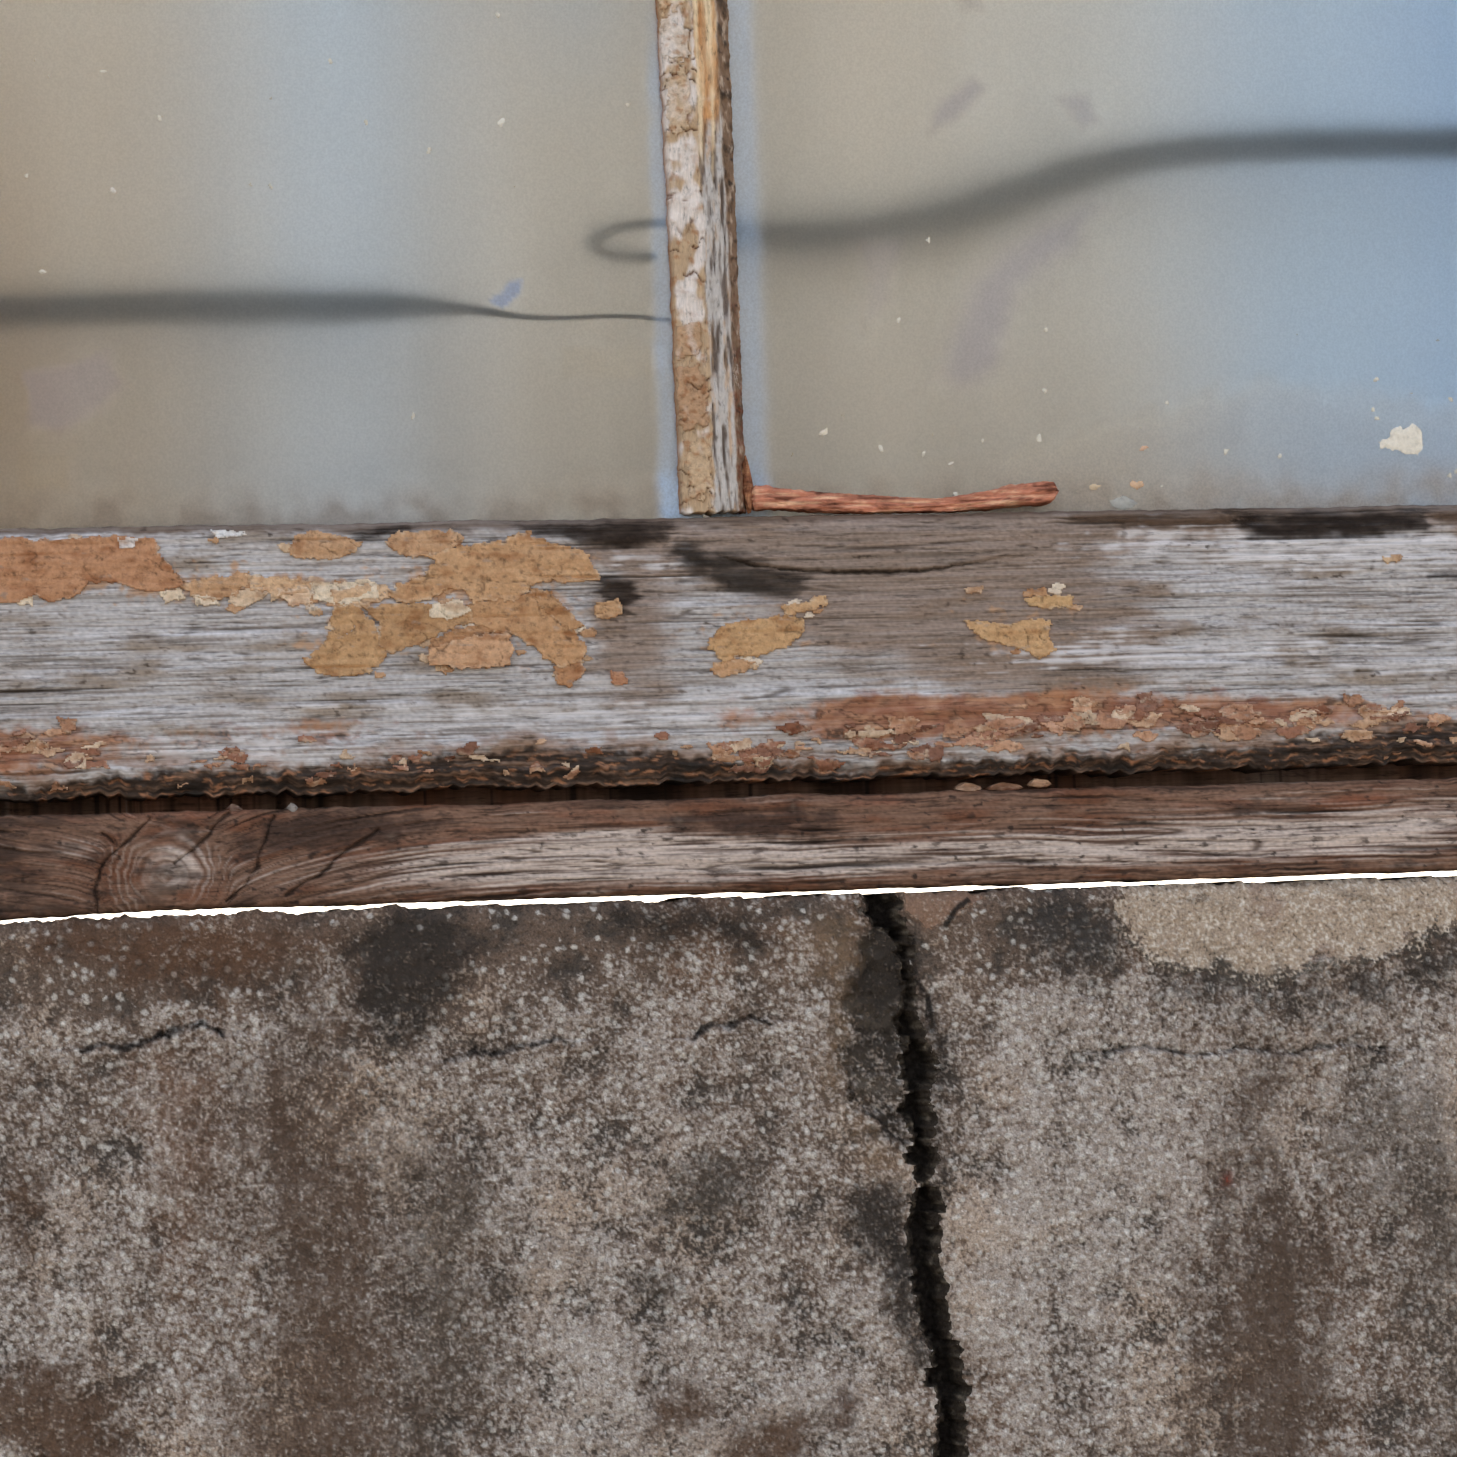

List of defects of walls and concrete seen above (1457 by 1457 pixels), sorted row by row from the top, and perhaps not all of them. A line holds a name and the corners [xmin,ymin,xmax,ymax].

peeling [1382,554,1403,564]
peeling [0,528,622,688]
peeling [707,595,828,678]
peeling [963,582,1083,660]
peeling [610,670,628,685]
peeling [0,716,110,792]
peeling [191,746,267,784]
peeling [298,735,317,743]
peeling [305,742,509,787]
peeling [529,738,604,780]
peeling [654,691,1457,774]
crack [843,893,972,1457]